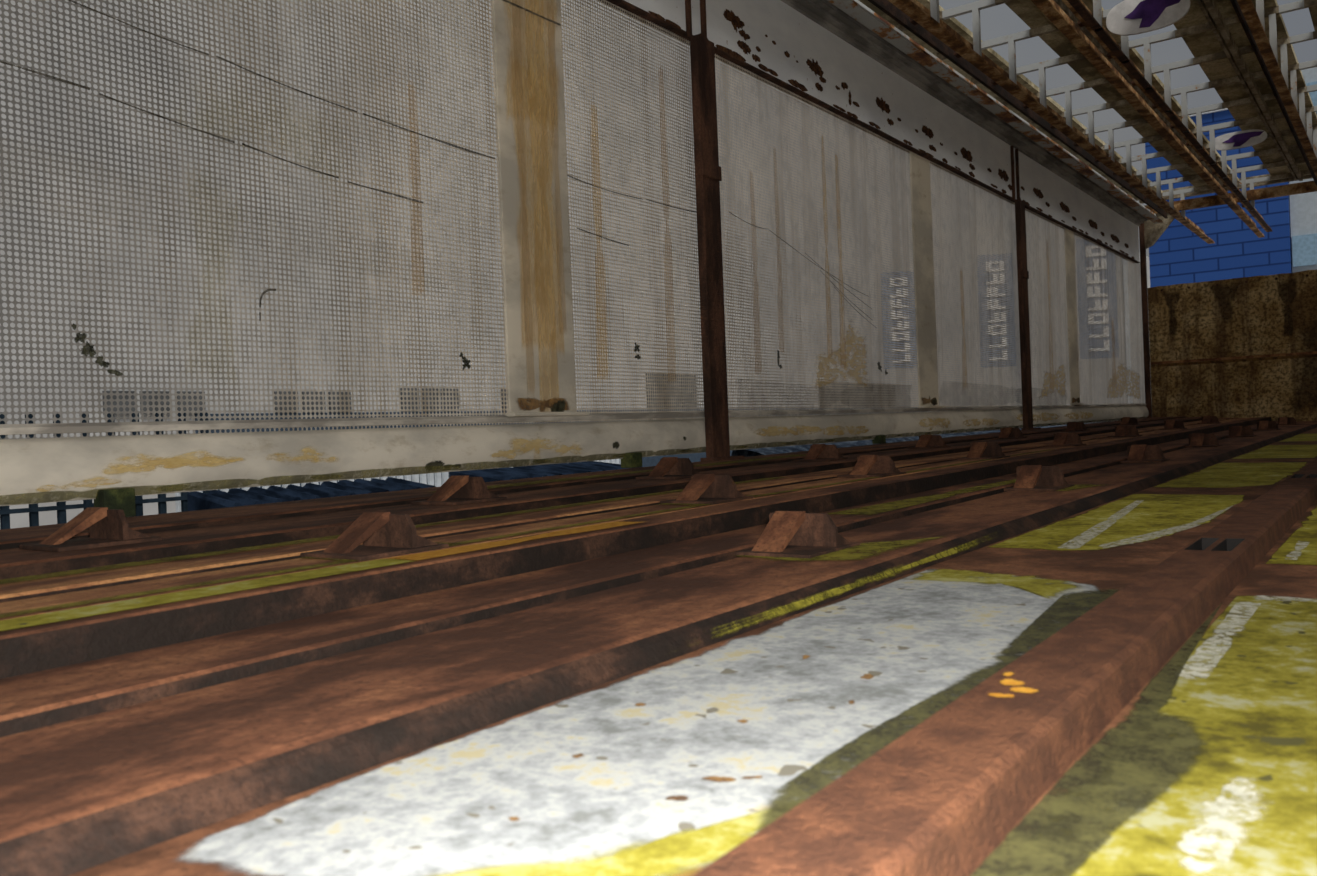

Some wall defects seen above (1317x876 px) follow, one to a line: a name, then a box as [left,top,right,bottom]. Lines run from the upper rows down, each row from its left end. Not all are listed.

rust [698,33,808,91]
peeling [723,9,860,107]
peeling [876,97,901,126]
peeling [915,125,1129,248]